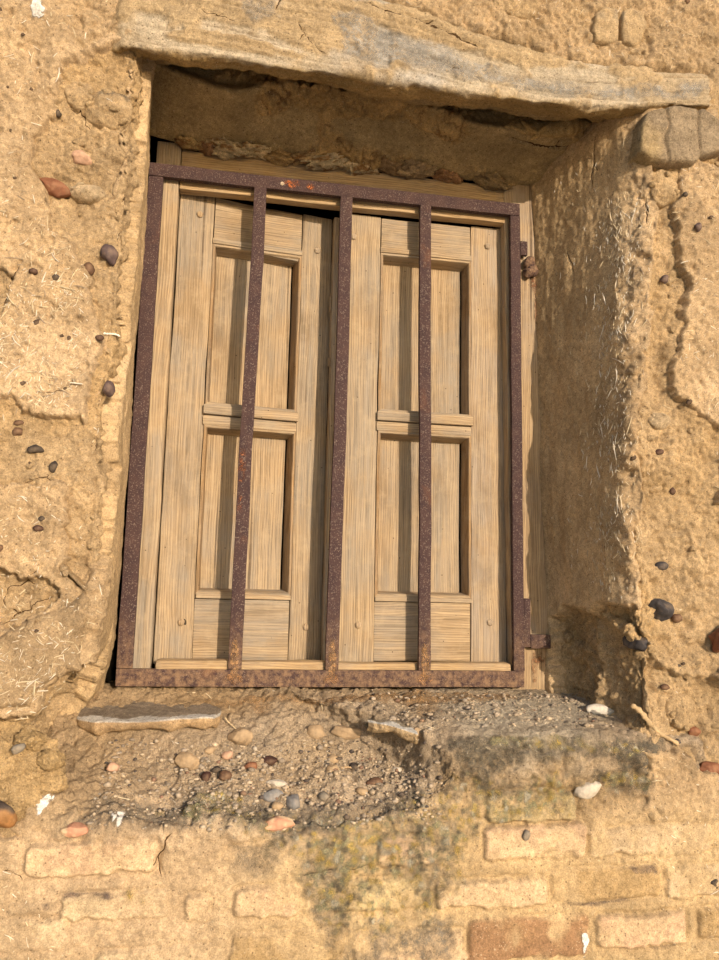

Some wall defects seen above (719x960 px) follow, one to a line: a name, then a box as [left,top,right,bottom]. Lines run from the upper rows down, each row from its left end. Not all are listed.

spalling [0,50,148,734]
crack [3,571,52,623]
rust [227,642,508,706]
leakage [448,736,664,796]
leakage [82,793,358,838]
leakage [365,919,454,960]